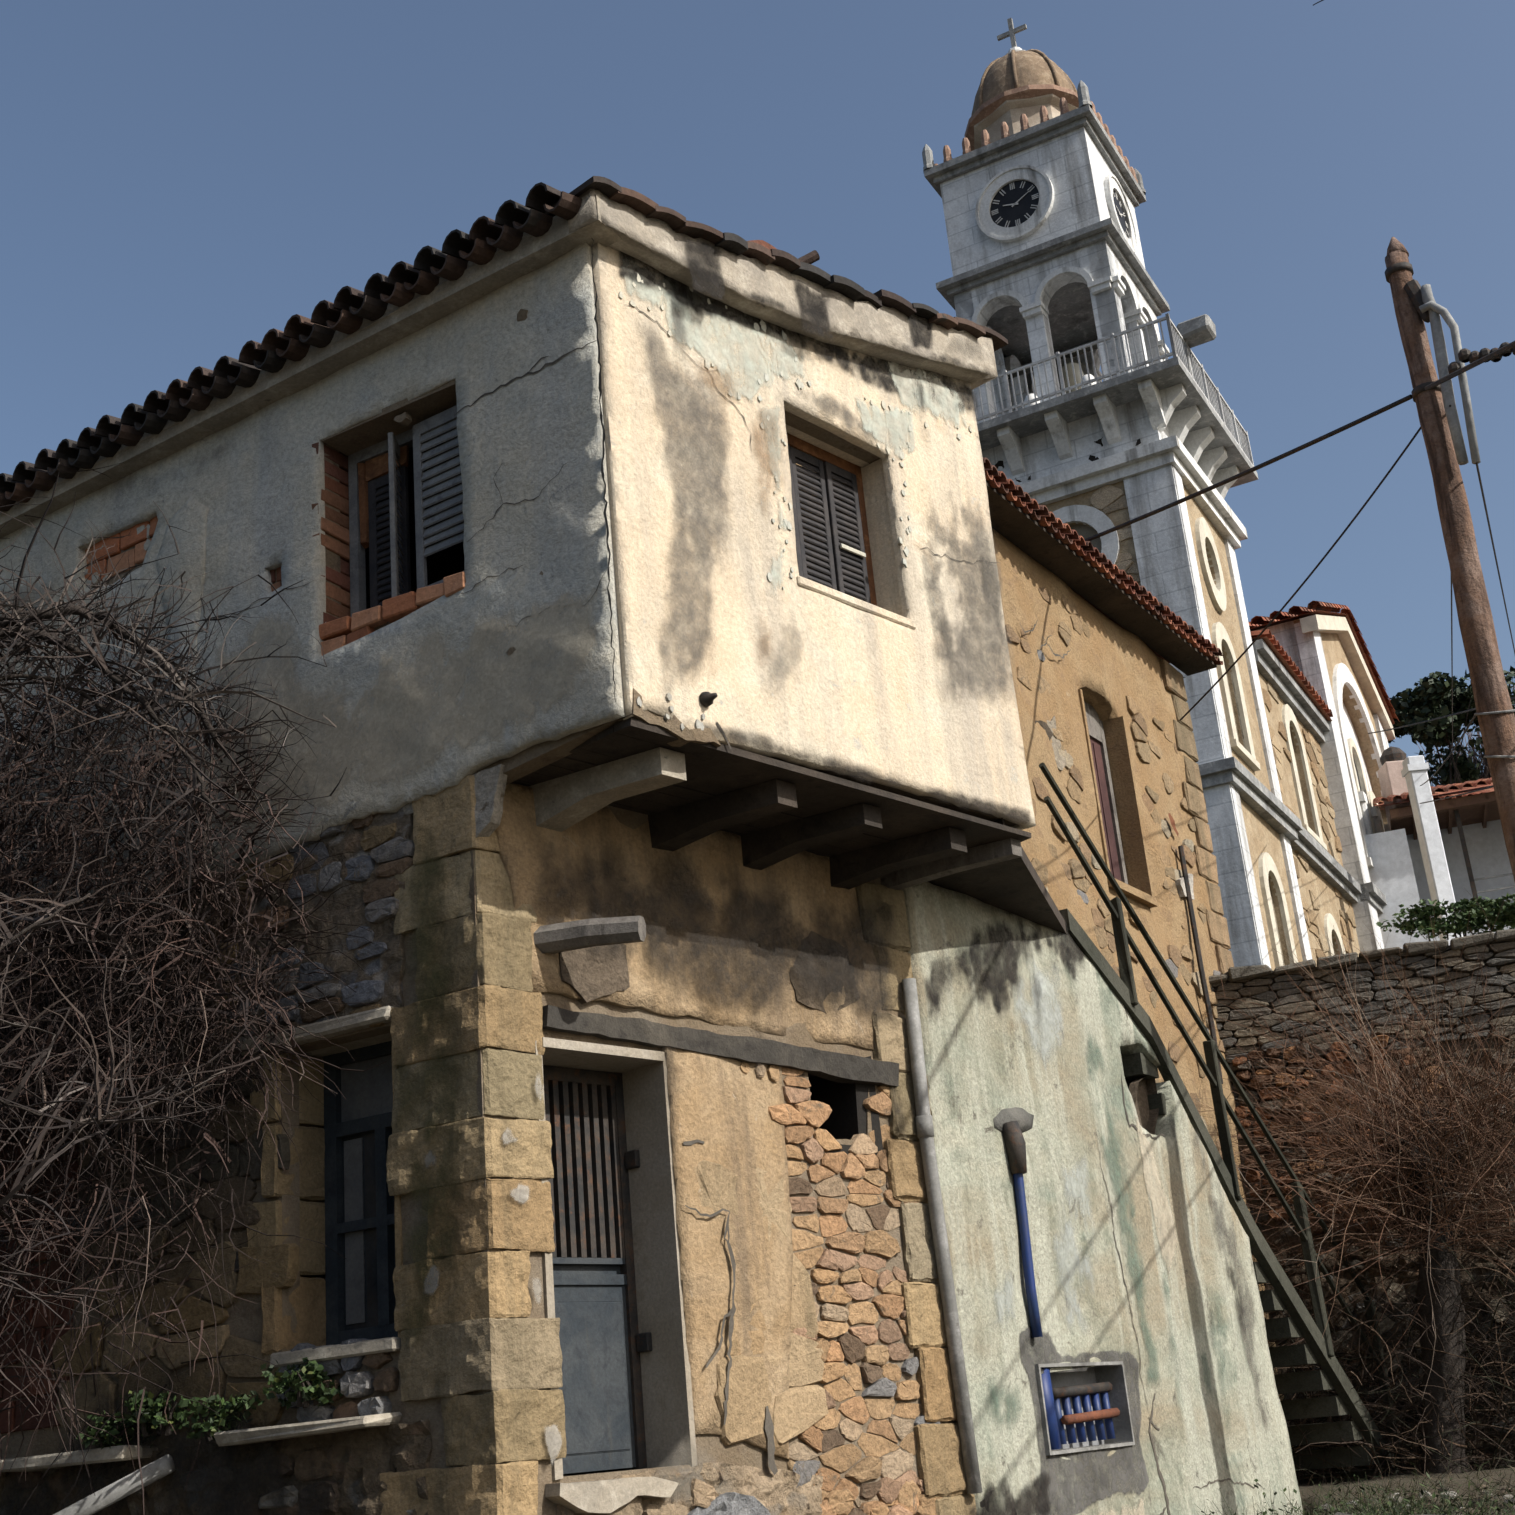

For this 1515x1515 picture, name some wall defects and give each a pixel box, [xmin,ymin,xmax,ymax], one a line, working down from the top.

damp [620,239,977,411]
spalling [84,516,158,588]
crack [454,238,752,702]
damp [649,338,727,670]
damp [819,398,864,428]
damp [927,511,1007,690]
damp [541,850,892,1018]
damp [926,920,1084,1061]
spalling [768,1067,943,1515]